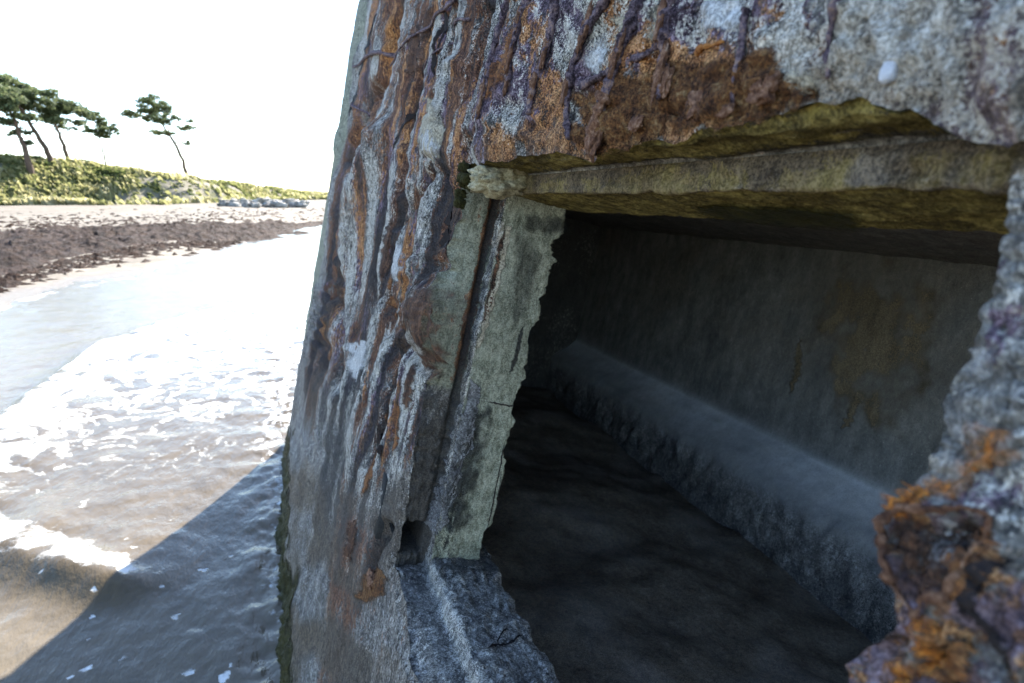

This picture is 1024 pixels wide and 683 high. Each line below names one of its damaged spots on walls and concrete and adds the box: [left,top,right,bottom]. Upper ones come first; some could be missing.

rust [404,7,434,75]
rust [484,27,521,98]
rust [379,221,398,320]
rust [360,364,417,494]
rust [881,479,960,521]
rust [885,619,980,683]